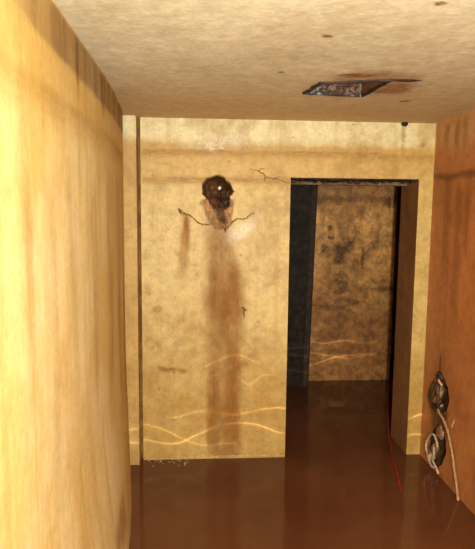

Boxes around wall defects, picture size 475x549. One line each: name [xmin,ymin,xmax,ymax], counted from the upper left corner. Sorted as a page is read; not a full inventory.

crack [178,208,254,232]
water stain [333,240,354,263]
corrosion [210,271,241,324]